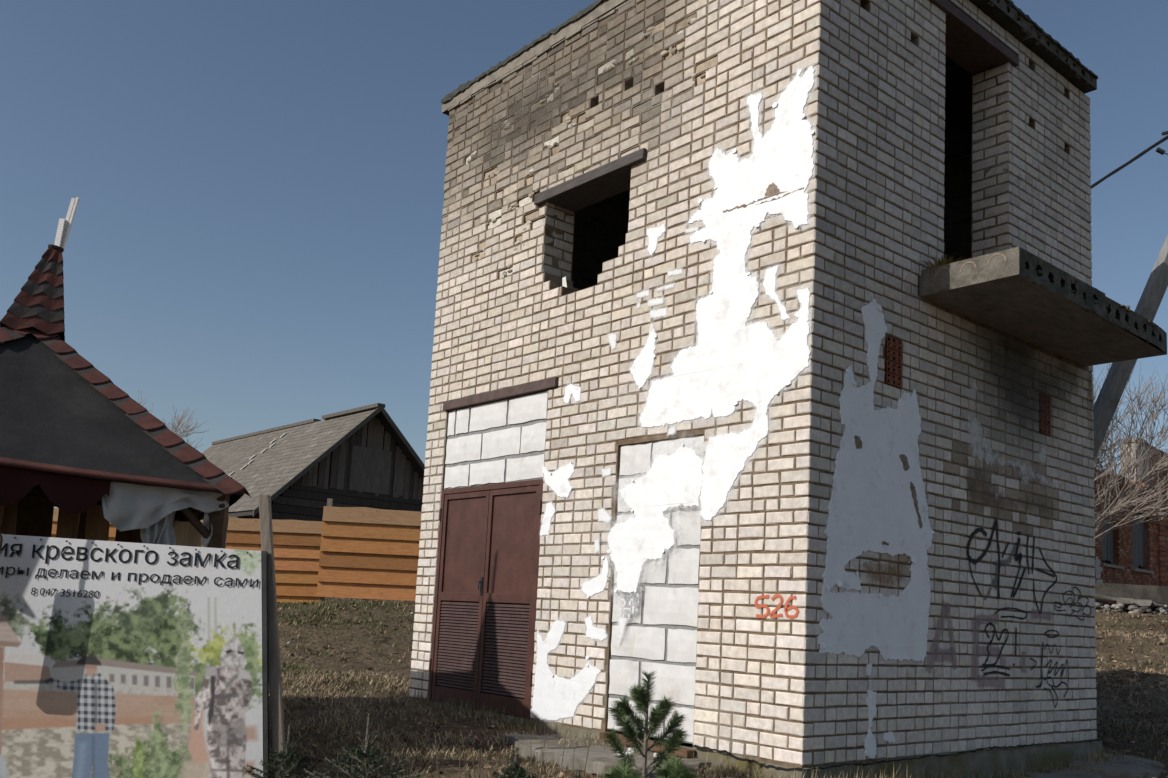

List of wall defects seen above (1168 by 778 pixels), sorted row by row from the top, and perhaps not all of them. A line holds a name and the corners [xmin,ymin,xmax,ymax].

spalling [660,18,697,57]
flaking render [581,66,815,598]
flaking render [564,384,581,403]
flaking render [540,462,575,536]
flaking render [817,299,935,662]
flaking render [584,616,608,641]
flaking render [532,620,601,721]